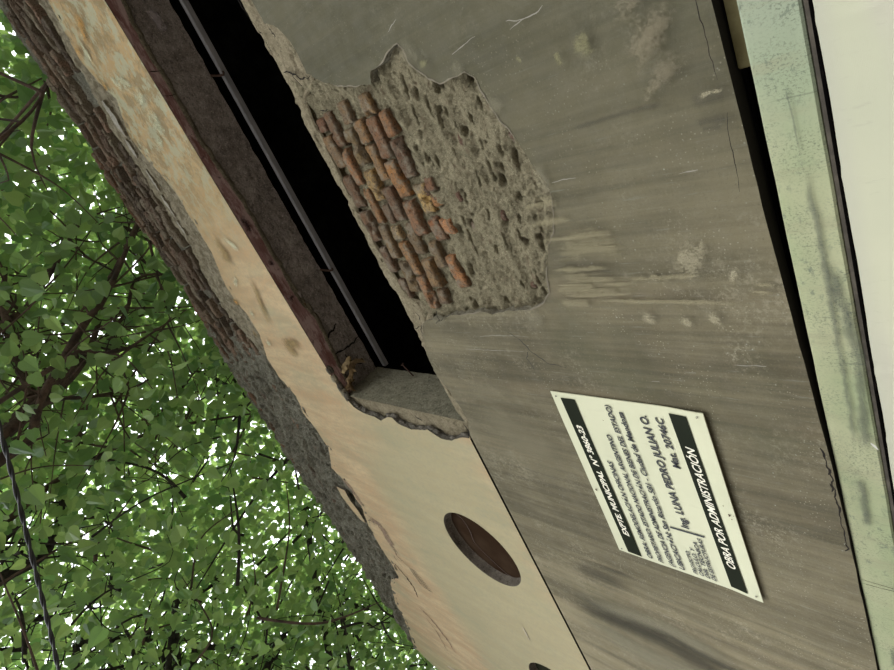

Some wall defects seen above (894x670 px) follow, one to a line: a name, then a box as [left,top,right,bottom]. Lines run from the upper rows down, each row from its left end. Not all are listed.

spalling [0,0,417,648]
spalling [121,0,472,439]
spalling [291,43,554,346]
crack [695,0,717,77]
crack [727,117,740,192]